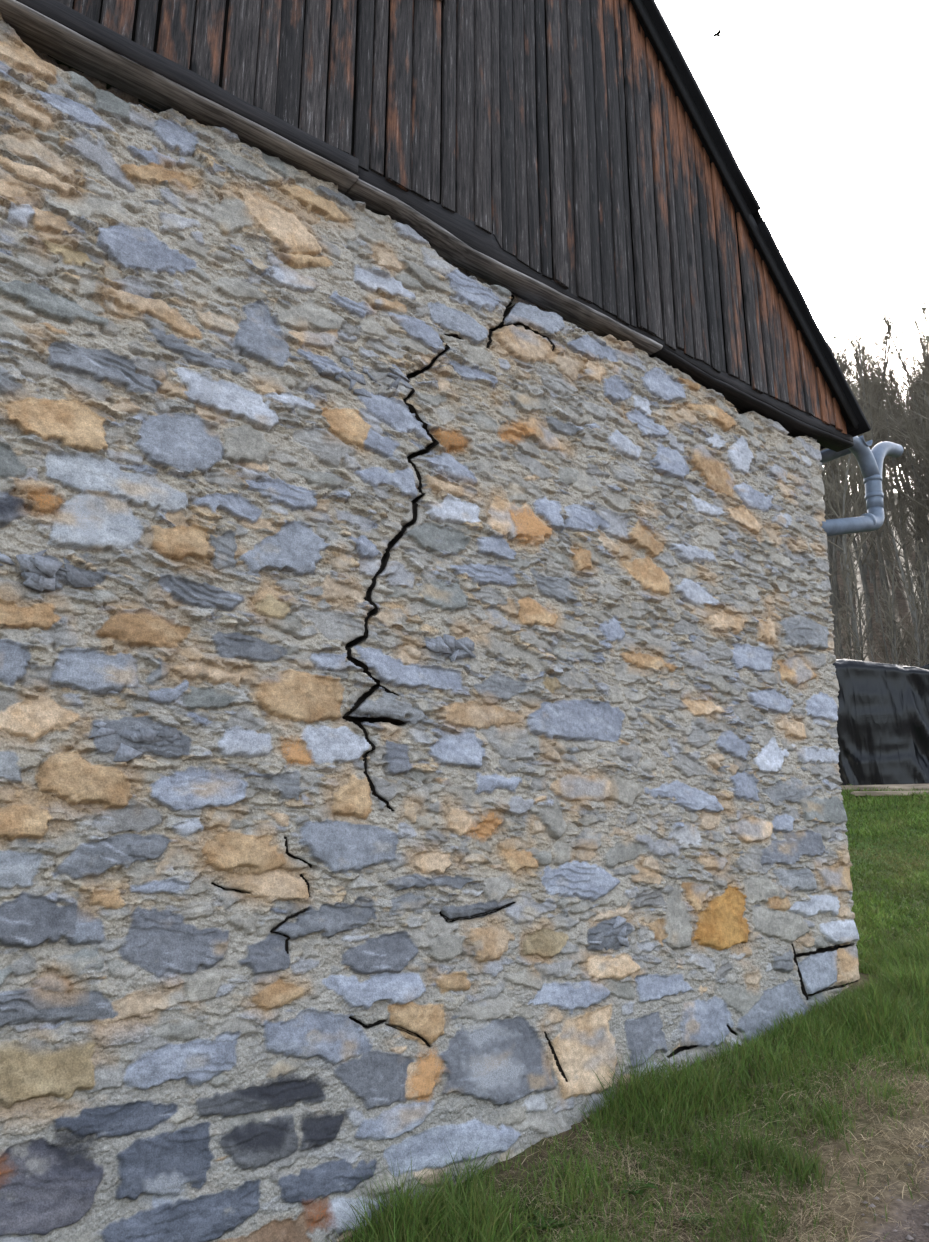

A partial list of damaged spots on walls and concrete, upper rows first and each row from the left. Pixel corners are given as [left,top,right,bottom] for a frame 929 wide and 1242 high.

crack [342,295,555,811]
crack [270,837,312,954]
crack [791,944,859,1000]
crack [349,1017,431,1047]